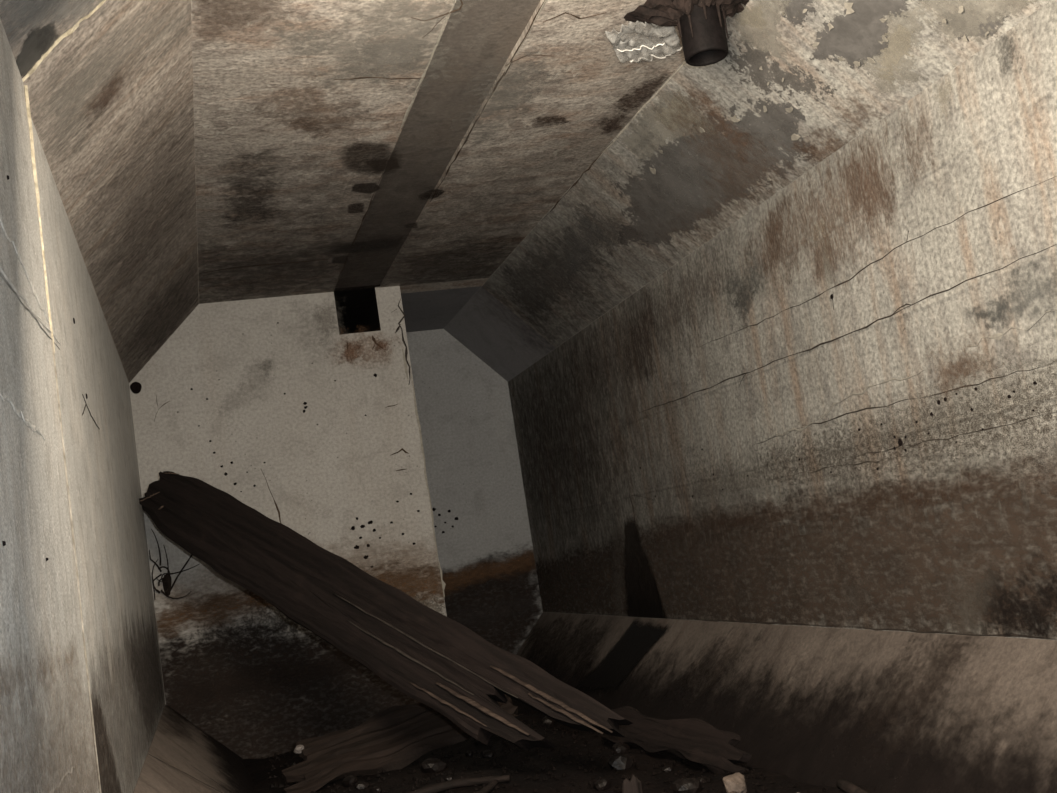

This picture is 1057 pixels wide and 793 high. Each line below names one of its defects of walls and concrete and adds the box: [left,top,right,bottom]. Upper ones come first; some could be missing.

crack [0,273,60,350]
water stain [343,143,398,213]
water stain [534,117,569,125]
water stain [602,75,668,133]
crack [642,244,1056,412]
crack [702,176,1056,346]
water stain [90,590,421,793]
water stain [368,465,1057,793]